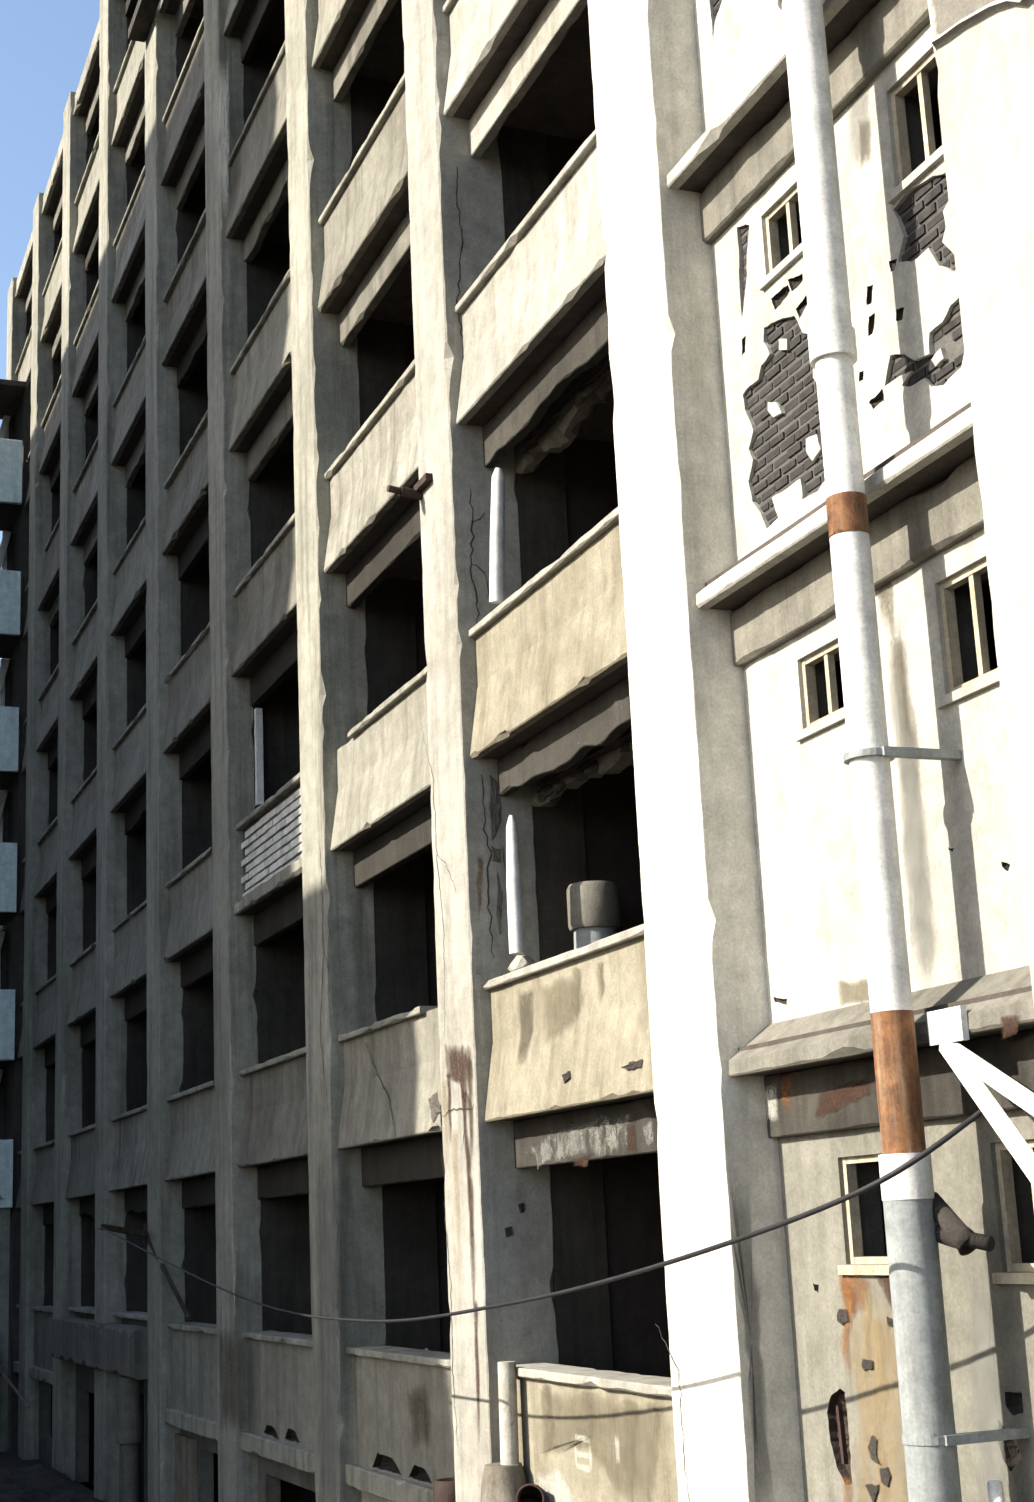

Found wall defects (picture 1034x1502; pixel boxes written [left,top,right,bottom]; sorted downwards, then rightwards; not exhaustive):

spalling [712,0,722,20]
spalling [889,175,956,272]
spalling [745,274,825,525]
spalling [866,285,875,336]
spalling [869,302,964,409]
crack [469,490,489,624]
crack [421,730,506,1033]
rust [443,1048,474,1285]
peeling [532,1112,653,1164]
rust [840,1275,891,1354]
spalling [827,1389,892,1502]